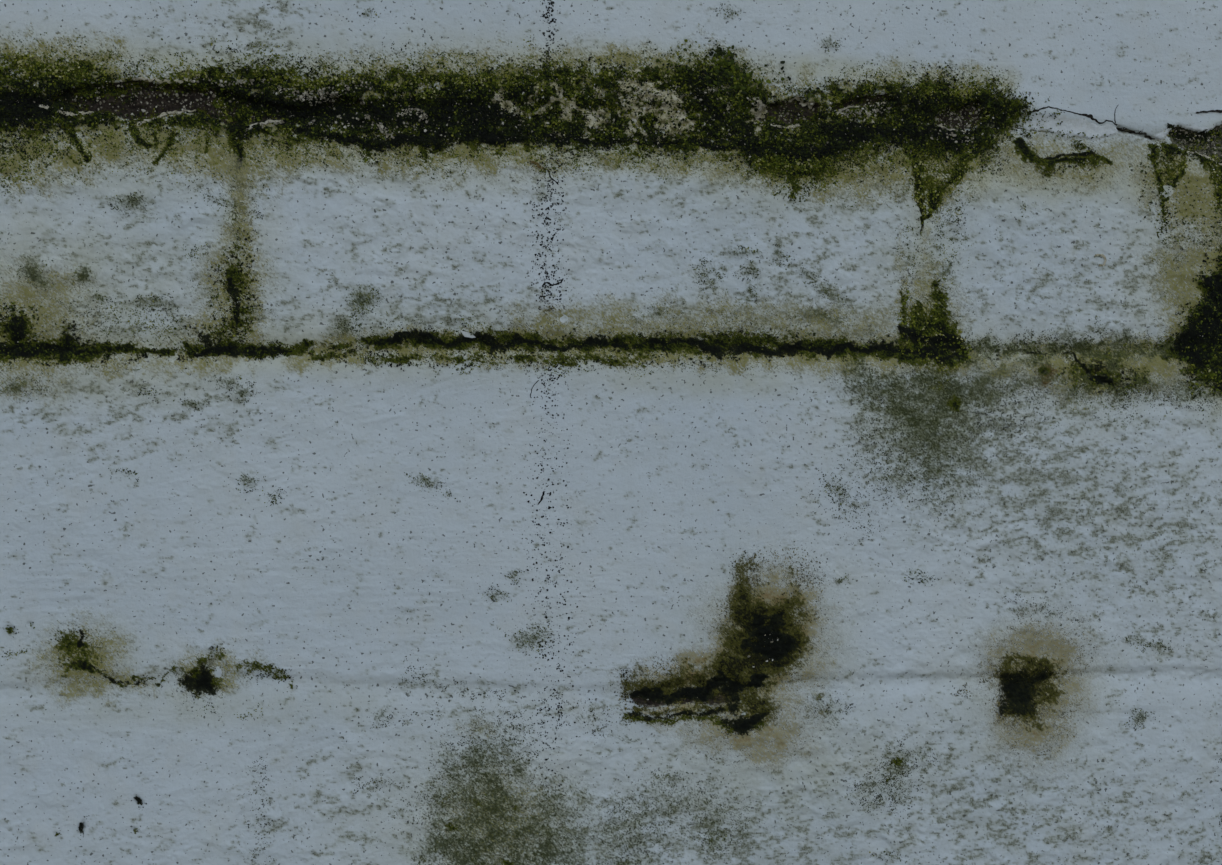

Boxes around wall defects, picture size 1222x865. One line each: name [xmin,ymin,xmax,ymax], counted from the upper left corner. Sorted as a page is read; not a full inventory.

peeling [1007,96,1118,145]
spalling [1153,110,1222,165]